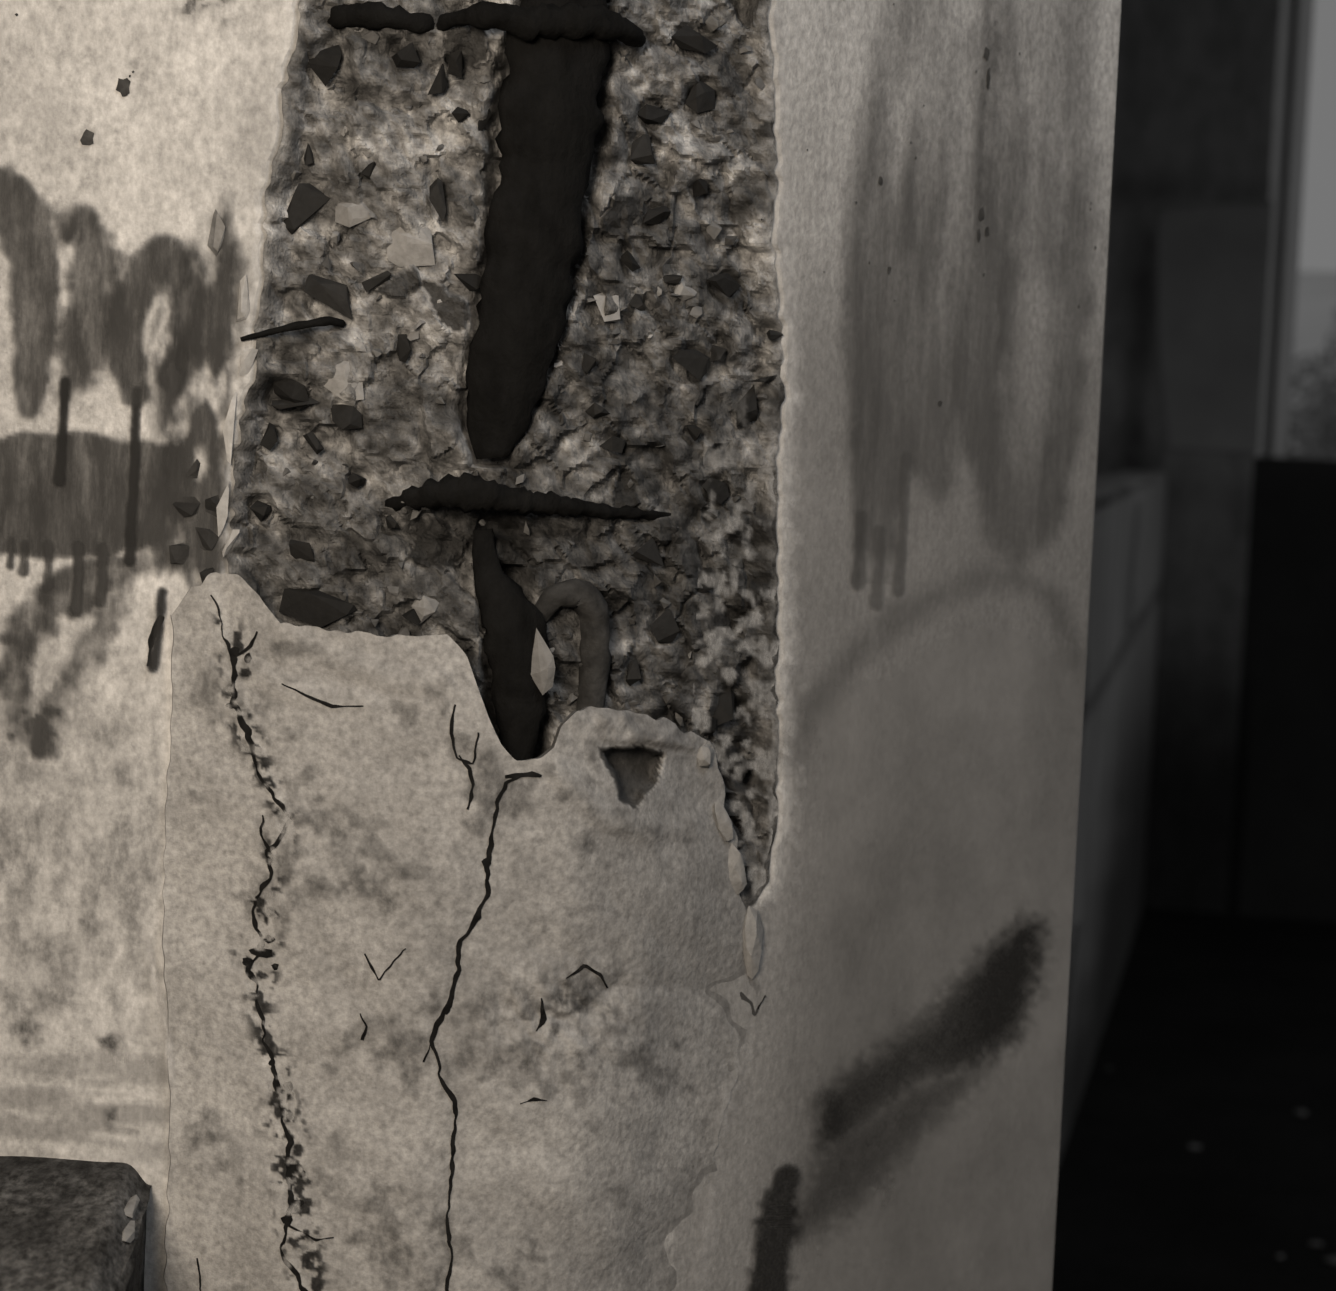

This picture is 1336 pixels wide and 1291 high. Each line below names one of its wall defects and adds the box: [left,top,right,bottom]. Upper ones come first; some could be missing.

spalling [137,0,793,913]
crack [282,683,363,708]
crack [210,595,334,1291]
crack [422,704,542,1291]
crack [536,964,608,1031]
crack [520,1096,547,1104]
crack [194,1258,202,1291]